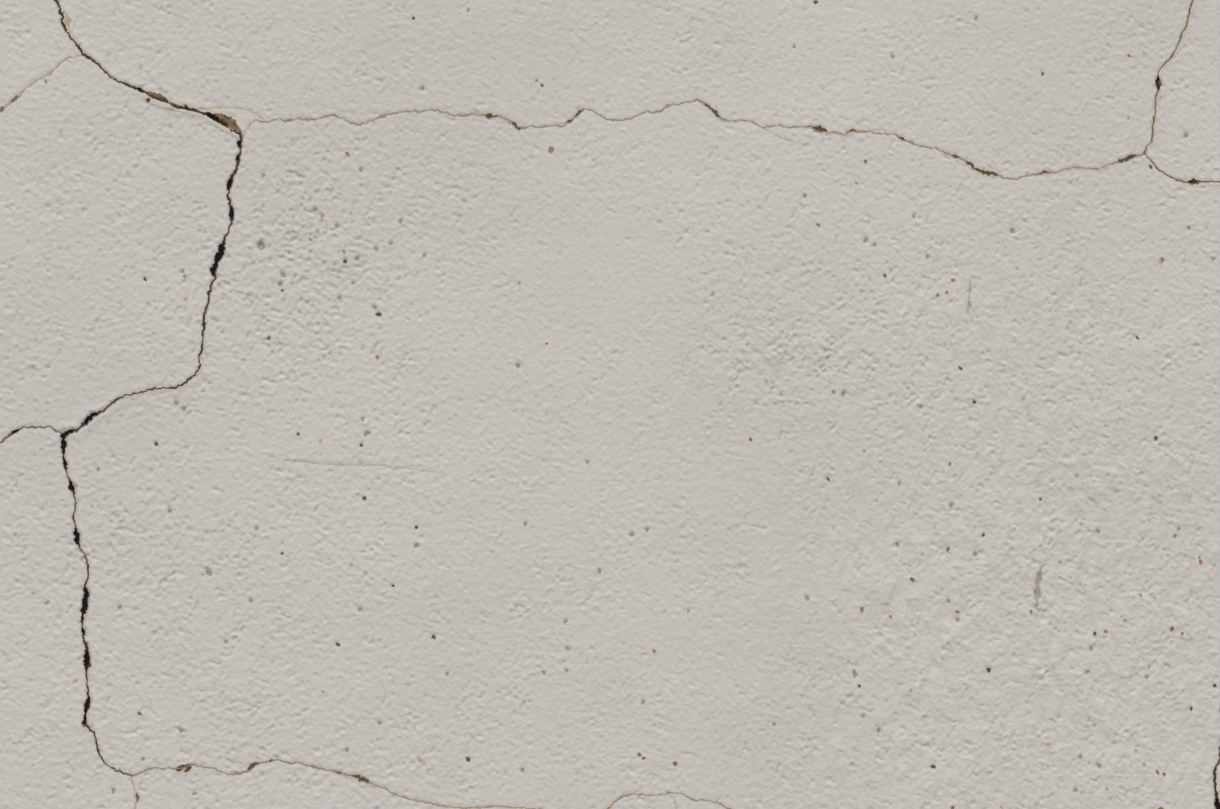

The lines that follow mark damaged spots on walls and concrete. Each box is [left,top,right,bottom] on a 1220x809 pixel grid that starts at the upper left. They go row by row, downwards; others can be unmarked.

crack [1007,0,1220,184]
crack [248,98,1003,178]
crack [0,0,535,809]
crack [607,792,731,809]
crack [1212,747,1220,809]